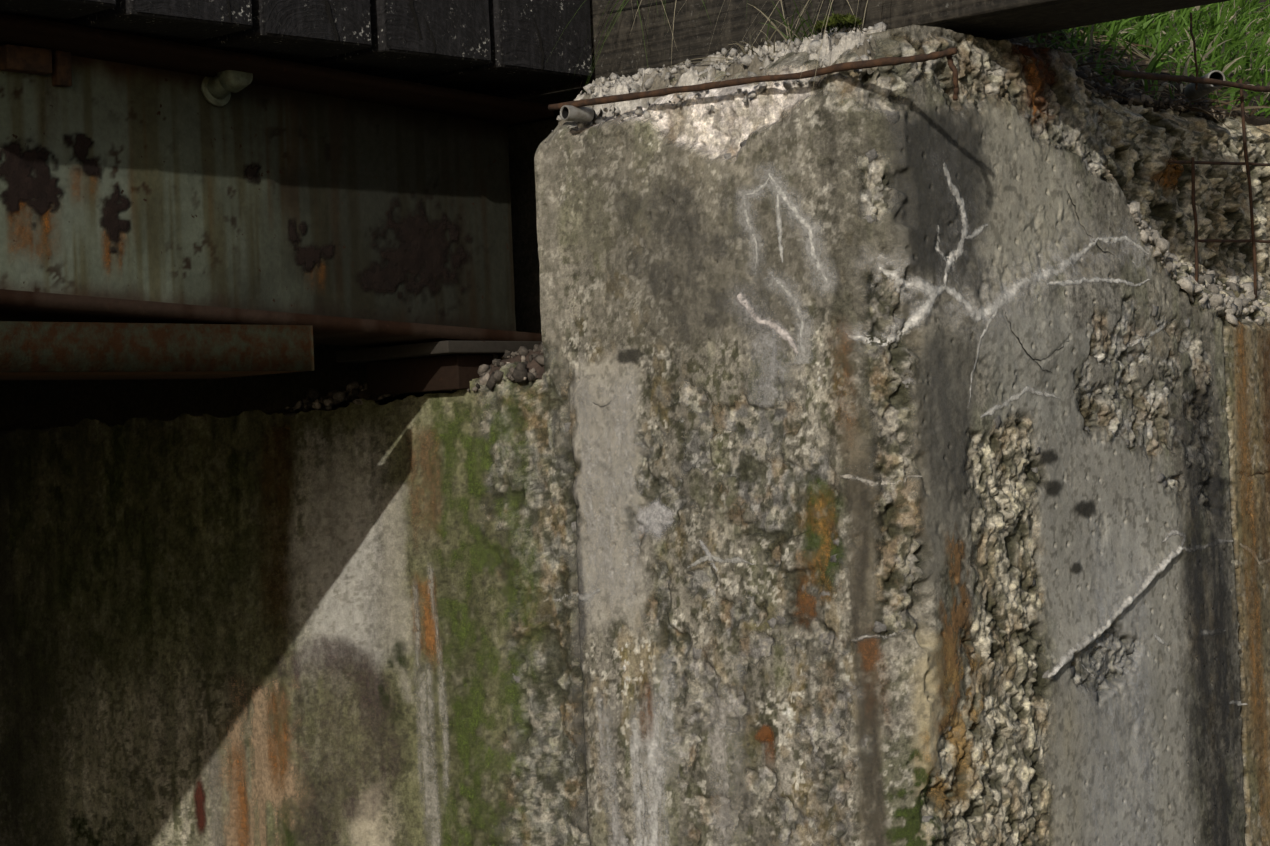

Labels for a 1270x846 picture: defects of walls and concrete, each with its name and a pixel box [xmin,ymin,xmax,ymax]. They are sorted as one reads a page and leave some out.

corrosion [1011,44,1066,123]
crack [728,168,834,408]
spalling [571,33,1270,512]
crack [848,163,1150,417]
crack [1126,319,1175,348]
corrosion [931,535,981,816]
spalling [921,414,1056,846]
spalling [1069,621,1135,702]
crack [1048,530,1270,678]